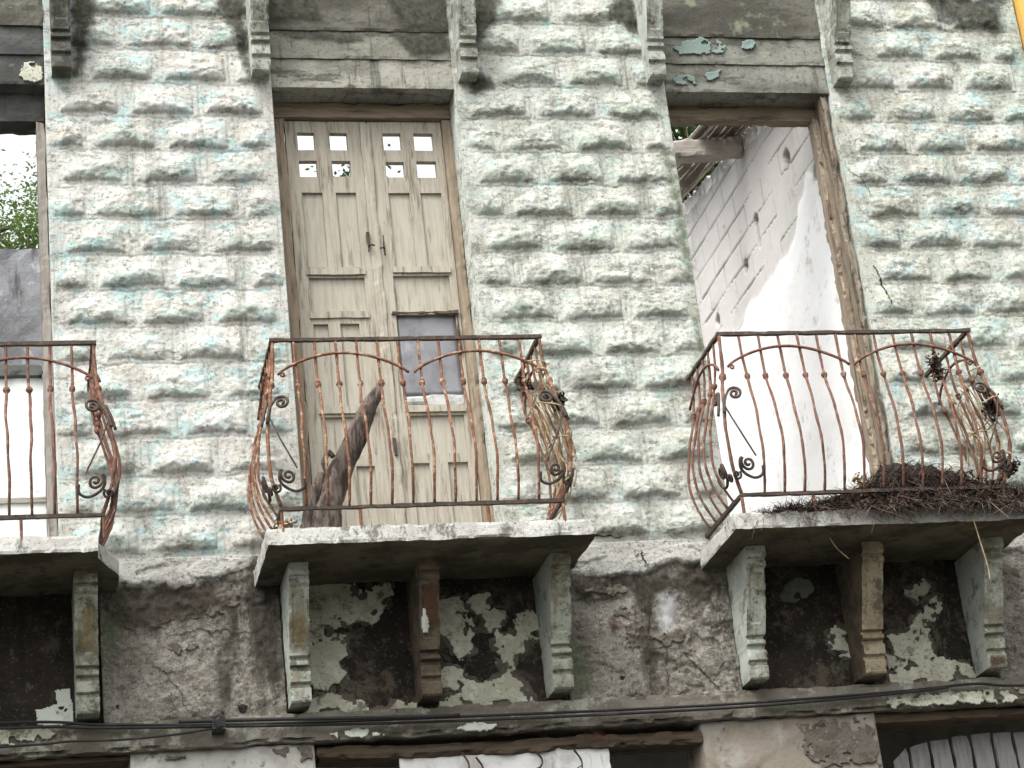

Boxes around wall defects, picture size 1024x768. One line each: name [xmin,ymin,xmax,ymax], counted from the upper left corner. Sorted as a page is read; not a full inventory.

peeling [673,37,726,55]
peeling [741,40,756,50]
peeling [19,62,43,83]
peeling [302,581,423,713]
peeling [421,589,540,708]
crack [642,592,720,695]
peeling [823,620,851,660]
peeling [883,578,1024,709]
peeling [0,689,74,745]
peeling [330,728,384,738]
peeling [457,722,497,732]
spalling [795,717,882,768]